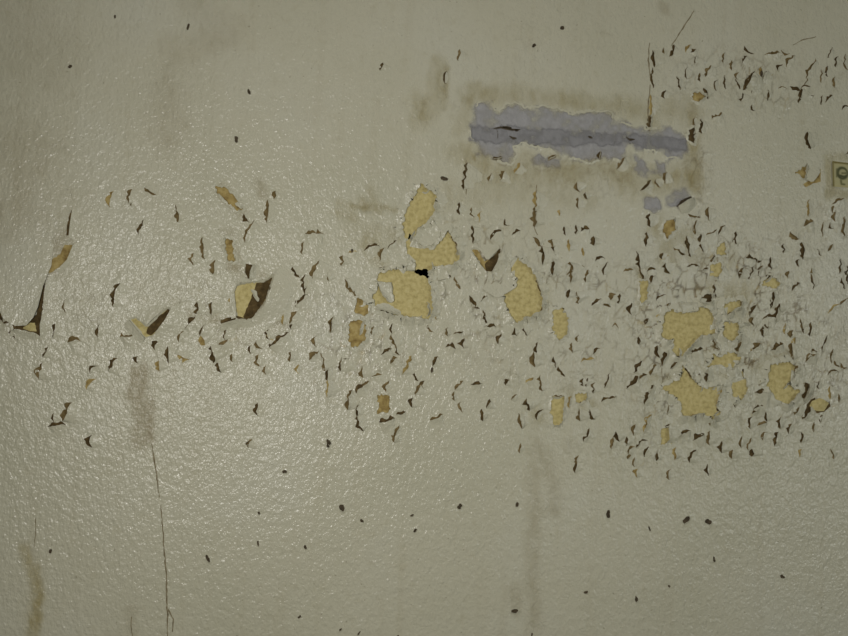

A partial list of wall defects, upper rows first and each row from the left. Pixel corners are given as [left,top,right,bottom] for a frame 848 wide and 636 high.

peeling [644,44,848,132]
peeling [672,112,726,146]
peeling [804,132,823,149]
peeling [461,142,556,190]
peeling [641,172,674,195]
peeling [792,162,821,187]
peeling [0,209,81,380]
peeling [105,176,848,480]
peeling [48,402,93,437]
crack [151,444,174,636]